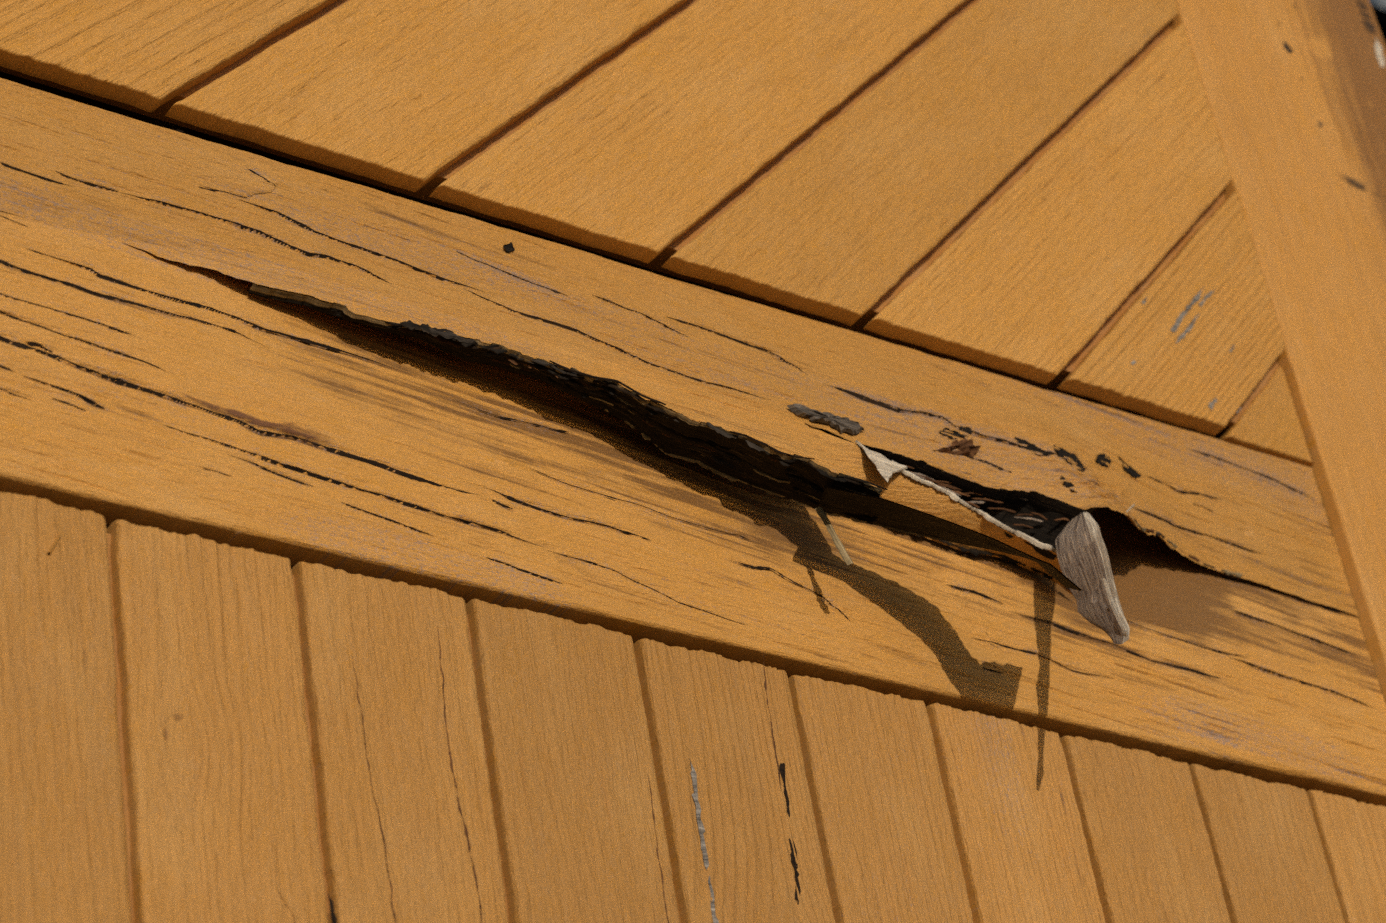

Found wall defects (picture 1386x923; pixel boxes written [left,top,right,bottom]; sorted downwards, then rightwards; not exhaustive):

crack [0,215,848,625]
spalling [846,440,1098,560]
peeling [690,760,719,923]